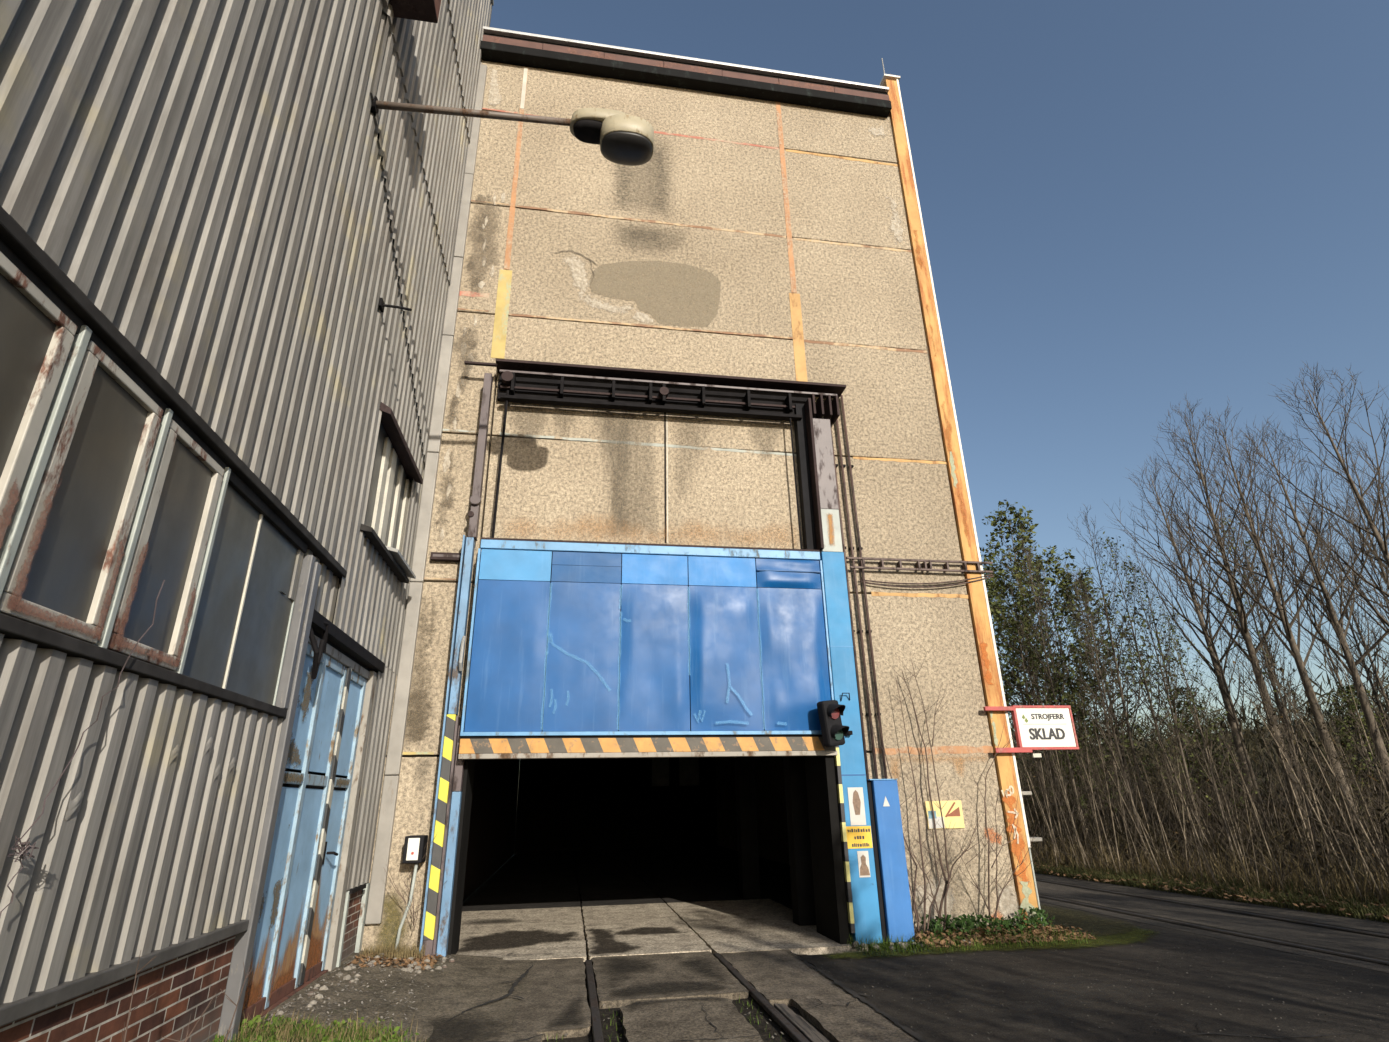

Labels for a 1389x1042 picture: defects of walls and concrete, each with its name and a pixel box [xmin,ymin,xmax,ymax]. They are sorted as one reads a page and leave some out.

spalling [564,256,653,324]
rust [242,882,328,1011]